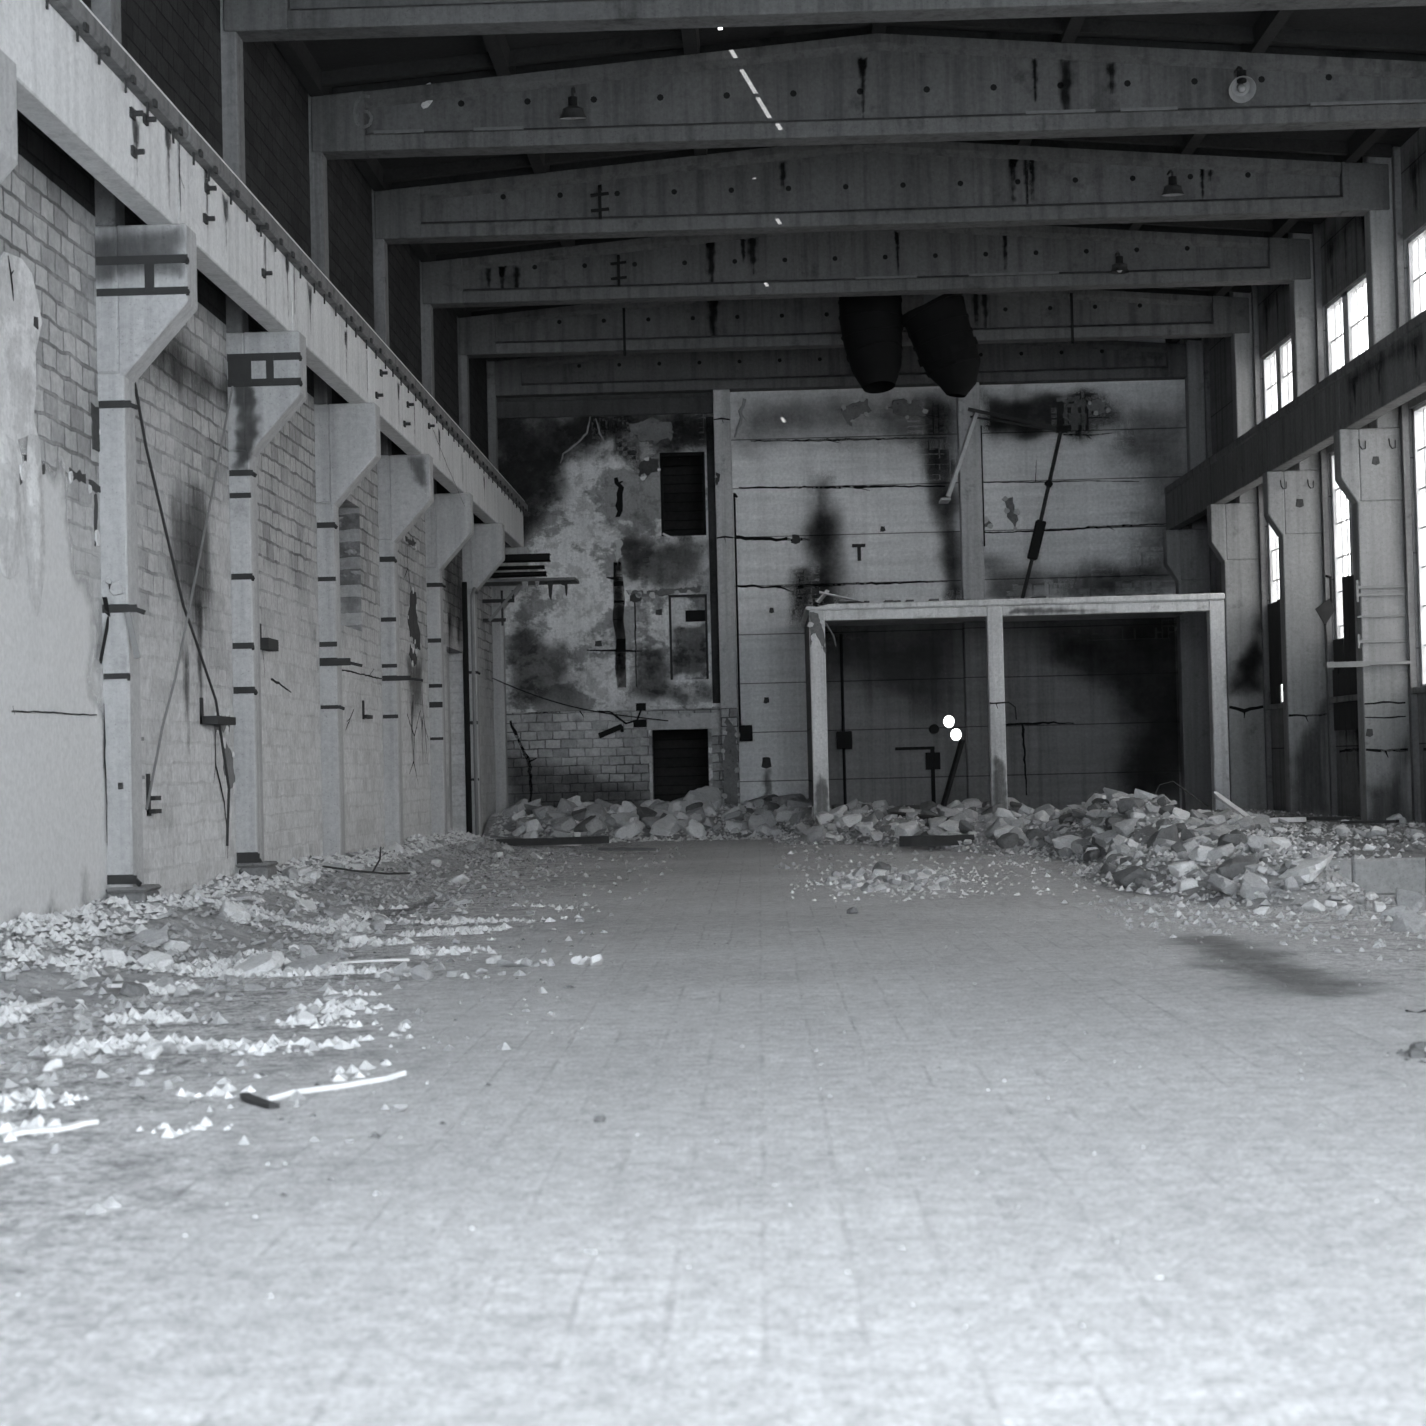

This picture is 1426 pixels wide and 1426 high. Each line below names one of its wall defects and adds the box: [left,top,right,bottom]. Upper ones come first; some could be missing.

water stain [858,58,867,118]
water stain [1060,60,1071,110]
water stain [1107,63,1115,90]
water stain [1009,159,1035,205]
water stain [153,338,258,468]
water stain [497,414,714,538]
water stain [621,540,699,585]
crack [717,534,810,542]
water stain [508,632,564,704]
water stain [618,628,705,700]